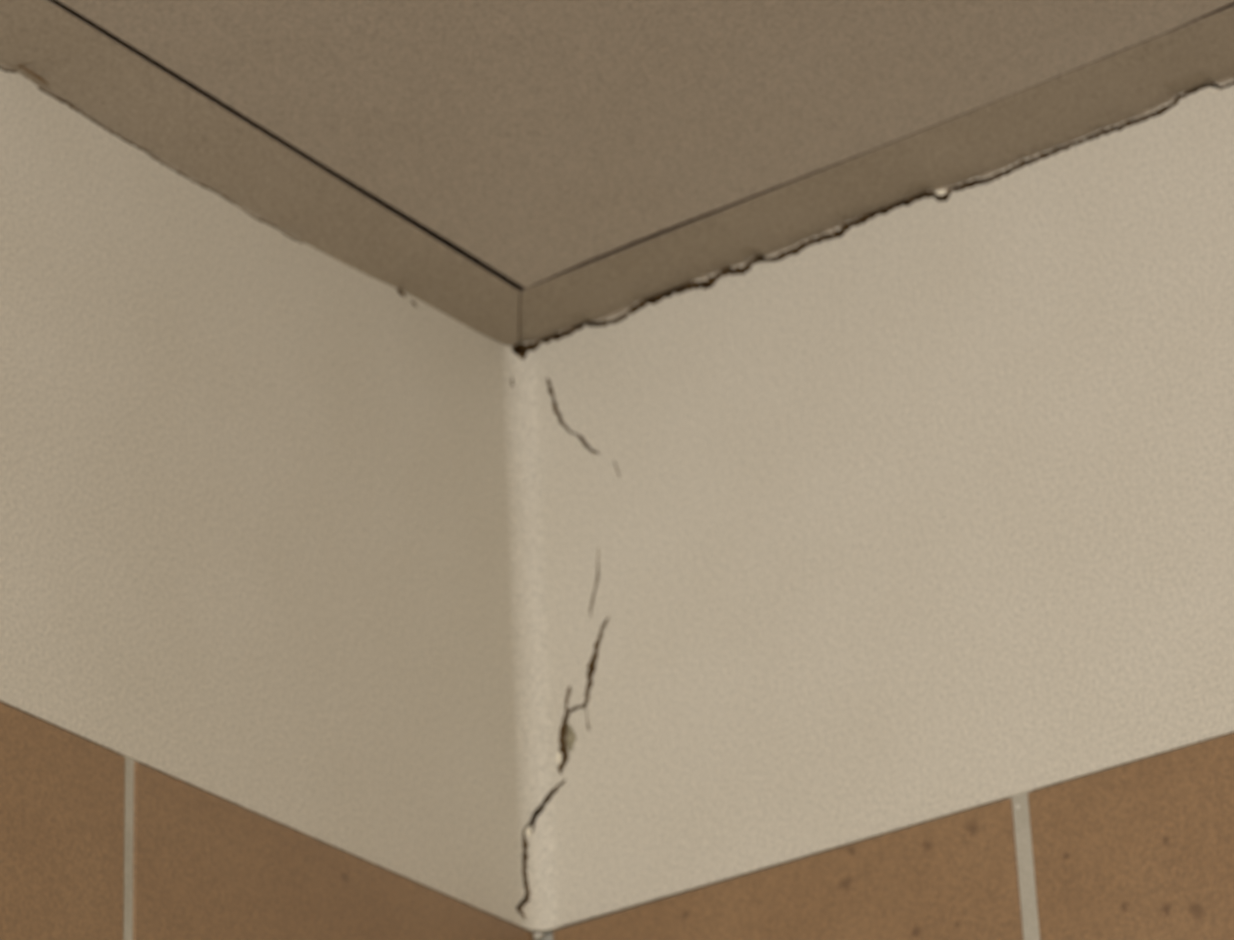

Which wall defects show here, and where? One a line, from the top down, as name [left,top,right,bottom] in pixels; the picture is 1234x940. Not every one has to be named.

crack [511,81,1234,477]
crack [516,547,610,919]